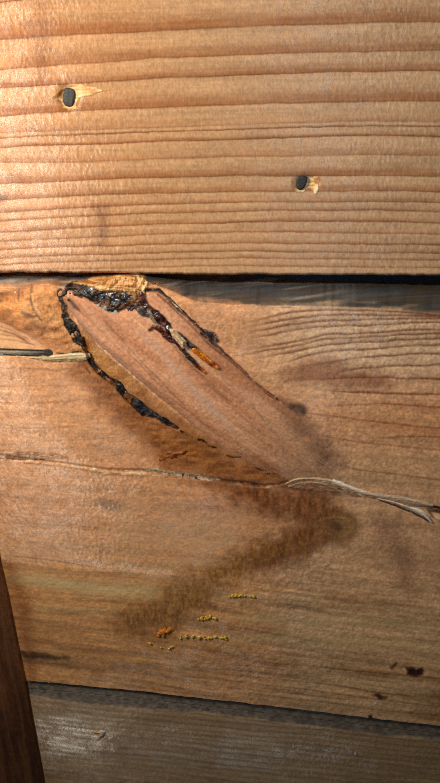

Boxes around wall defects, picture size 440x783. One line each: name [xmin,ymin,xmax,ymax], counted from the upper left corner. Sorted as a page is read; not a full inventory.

spalling [57,281,141,314]
water stain [74,346,339,633]
crack [424,505,440,513]